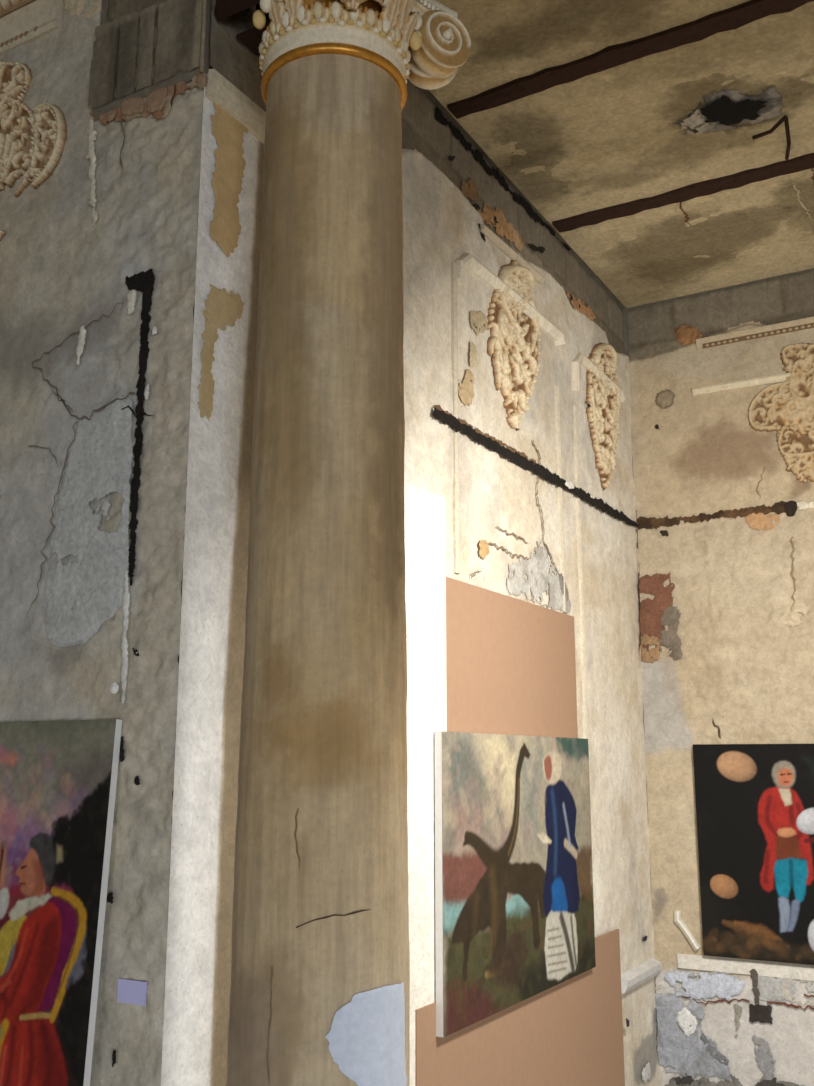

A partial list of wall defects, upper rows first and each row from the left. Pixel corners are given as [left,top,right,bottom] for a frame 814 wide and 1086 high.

spalling [673,87,791,160]
peeling [210,103,248,257]
flaking render [76,326,86,365]
peeling [198,284,244,419]
crack [26,300,135,617]
flaking render [479,540,489,559]
flaking render [507,538,571,614]
flaking render [637,573,682,663]
peeling [745,500,814,531]
peeling [325,982,407,1086]
flaking render [642,969,814,1086]
crack [682,993,814,1010]